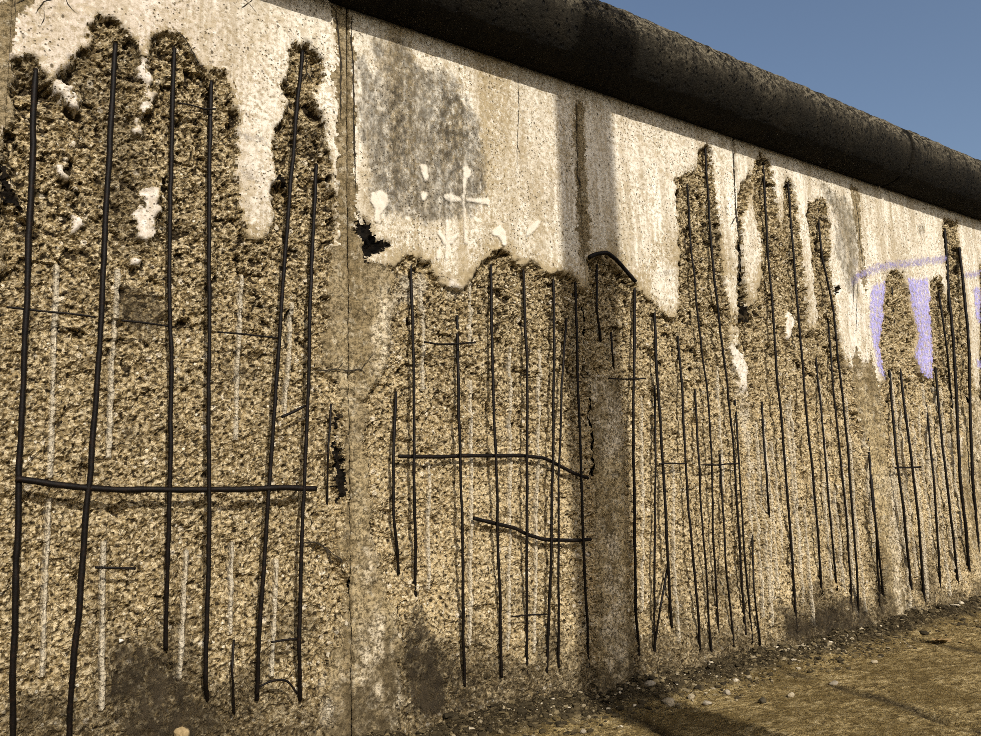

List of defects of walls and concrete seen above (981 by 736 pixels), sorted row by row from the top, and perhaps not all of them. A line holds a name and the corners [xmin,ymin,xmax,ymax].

spalling [0,0,391,736]
leakage [361,43,483,218]